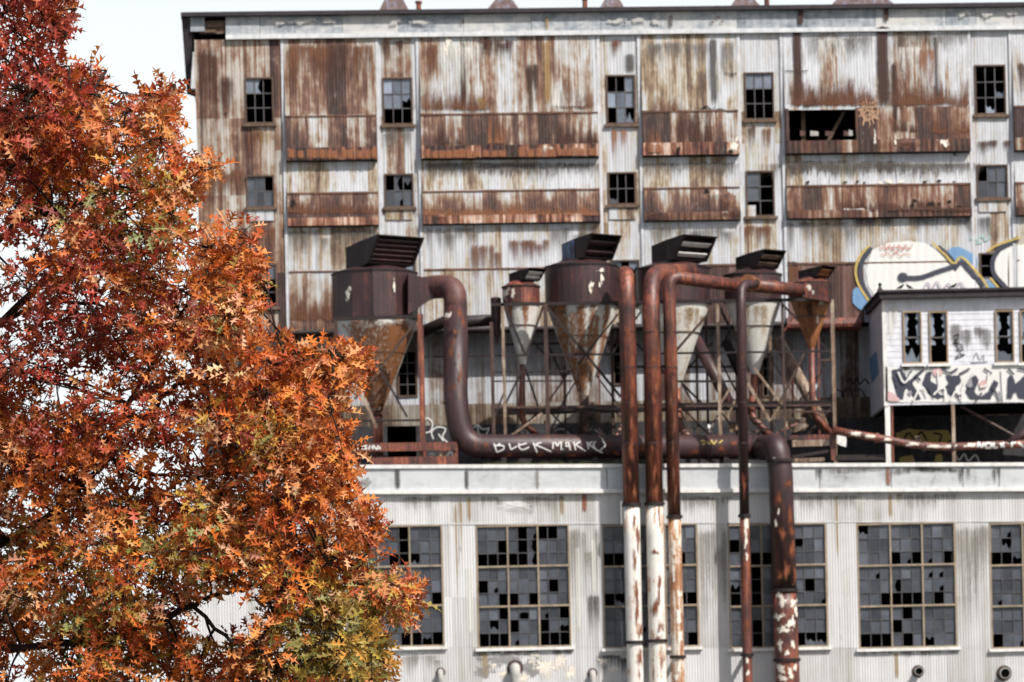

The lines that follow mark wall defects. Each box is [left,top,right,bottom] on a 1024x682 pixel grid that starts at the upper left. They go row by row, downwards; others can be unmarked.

rust [198,49,233,140]
rust [204,169,243,208]
rust [288,149,377,159]
rust [287,40,403,85]
rust [421,39,596,160]
rust [653,100,712,142]
rust [790,48,973,107]
rust [504,302,529,326]
rust [549,301,610,394]
peeling [633,515,663,679]
peeling [652,525,683,646]
peeling [773,592,798,681]